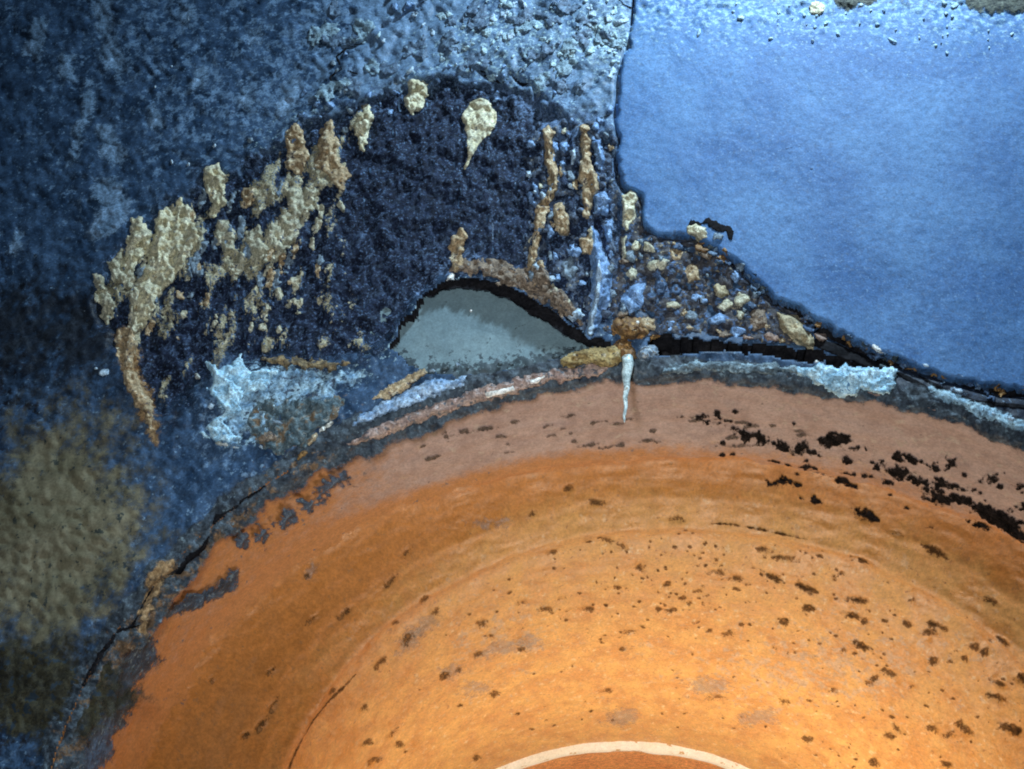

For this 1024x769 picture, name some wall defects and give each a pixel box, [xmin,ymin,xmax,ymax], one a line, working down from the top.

spalling [78,0,827,431]
rust [119,349,160,446]
leakage [195,353,372,449]
spalling [247,392,345,461]
leakage [797,360,897,398]
leakage [928,386,1024,432]
leakage [677,409,1024,543]
crack [81,473,285,687]